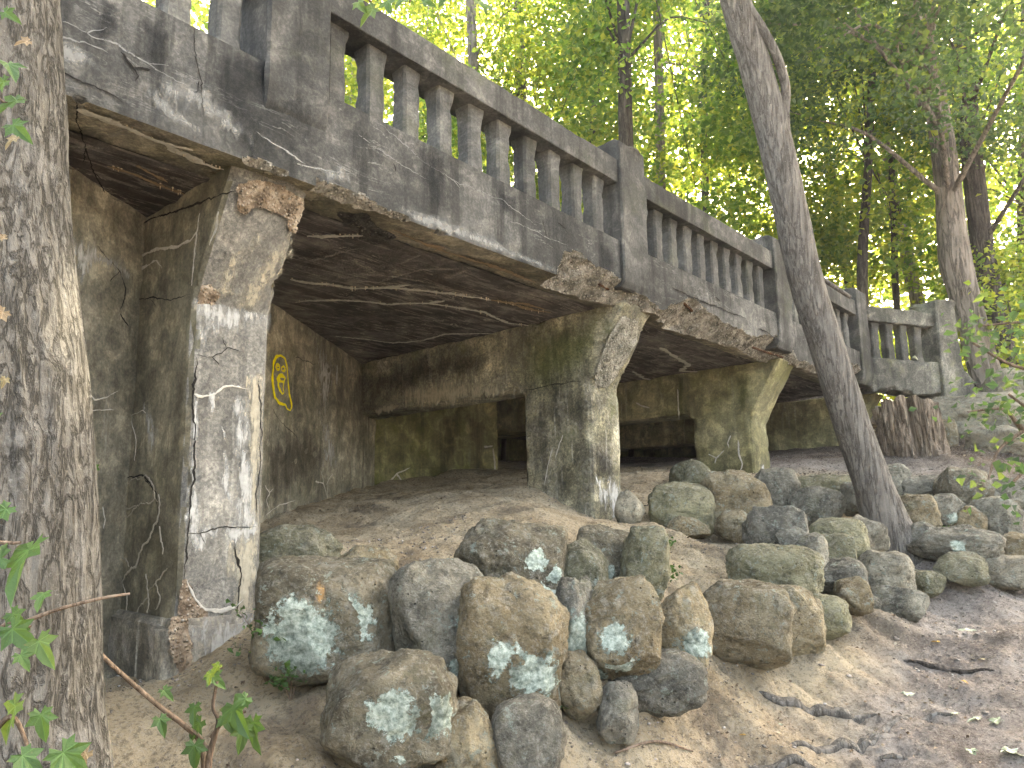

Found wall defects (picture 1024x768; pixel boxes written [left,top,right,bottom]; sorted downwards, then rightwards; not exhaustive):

crack [63,21,204,192]
spalling [235,156,410,245]
spalling [197,284,221,306]
spalling [540,249,818,389]
crack [127,474,158,526]
crack [184,338,300,610]
leakage [596,458,618,519]
spalling [168,579,209,674]